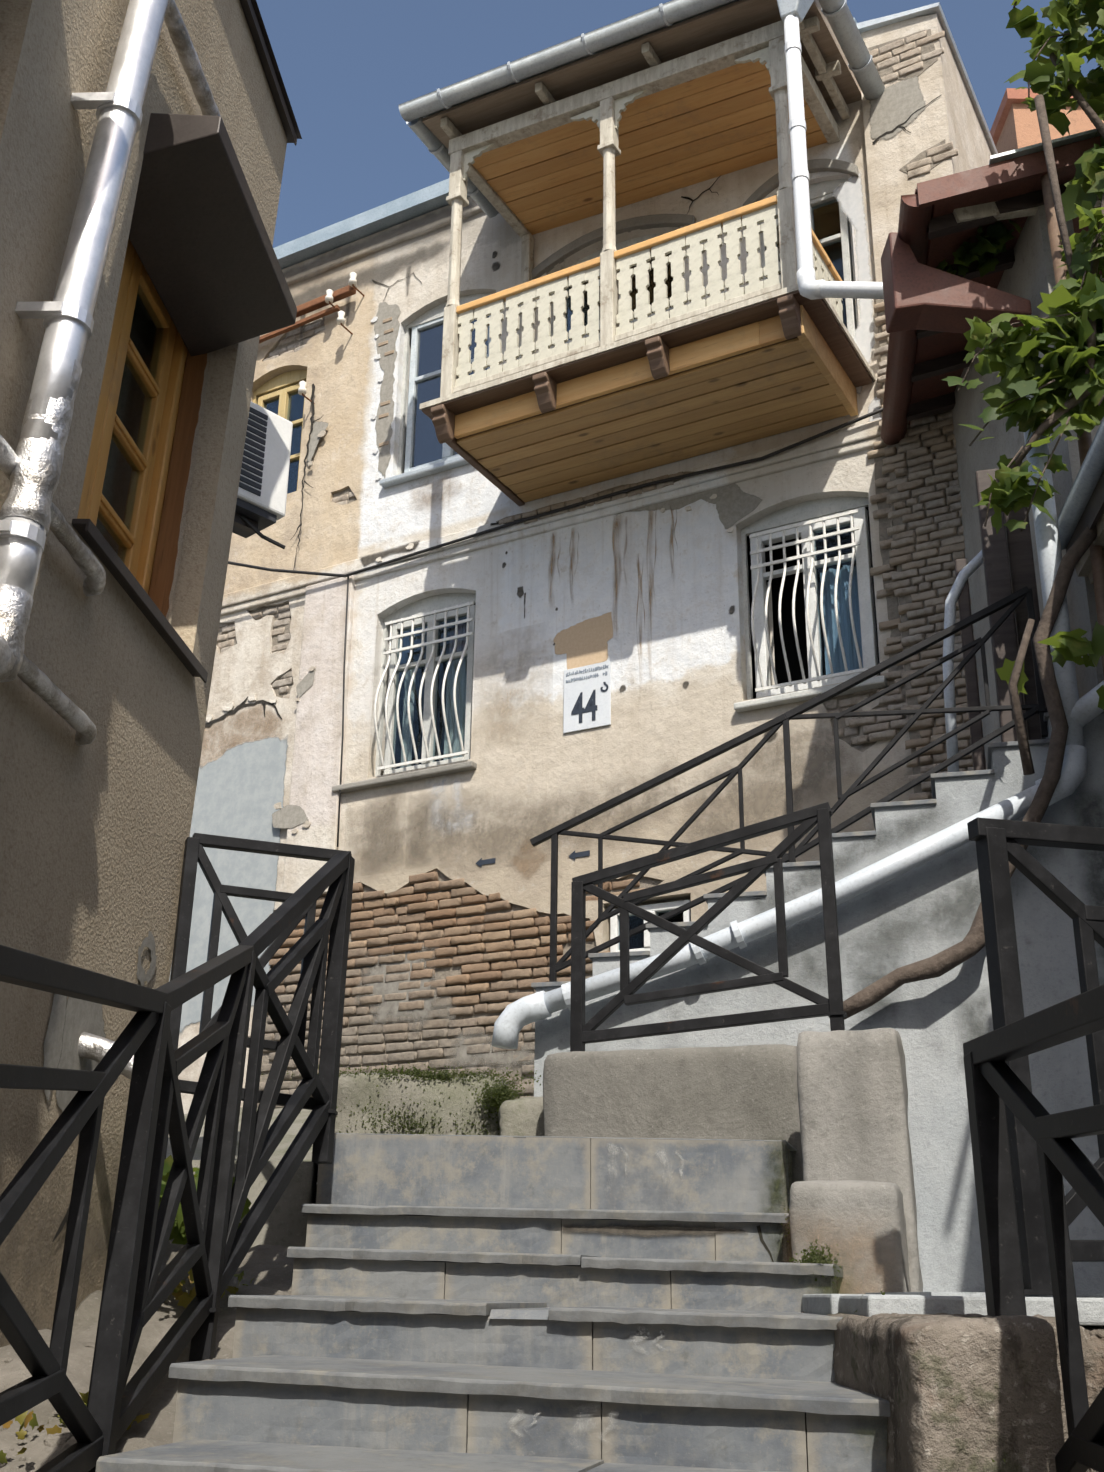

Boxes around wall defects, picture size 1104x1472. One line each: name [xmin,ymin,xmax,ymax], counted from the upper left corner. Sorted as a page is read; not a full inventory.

spalling [868,29,945,85]
crack [872,95,941,143]
spalling [370,302,401,481]
spalling [217,602,291,654]
crack [205,693,282,727]
spalling [272,666,316,702]
spalling [586,874,663,901]
flaking render [248,894,330,1108]
flaking render [339,869,610,1099]